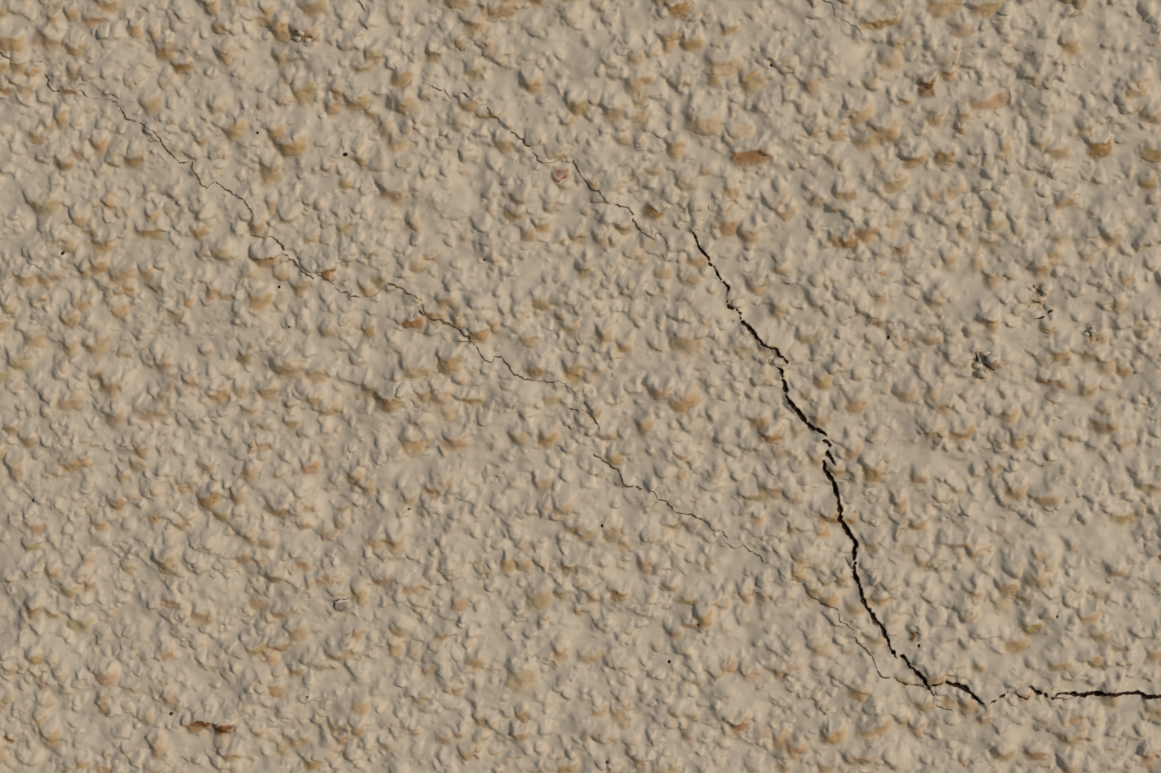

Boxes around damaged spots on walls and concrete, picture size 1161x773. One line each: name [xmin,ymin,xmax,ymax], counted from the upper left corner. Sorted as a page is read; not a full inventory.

crack [0,52,600,431]
crack [423,82,670,262]
crack [593,197,1161,717]